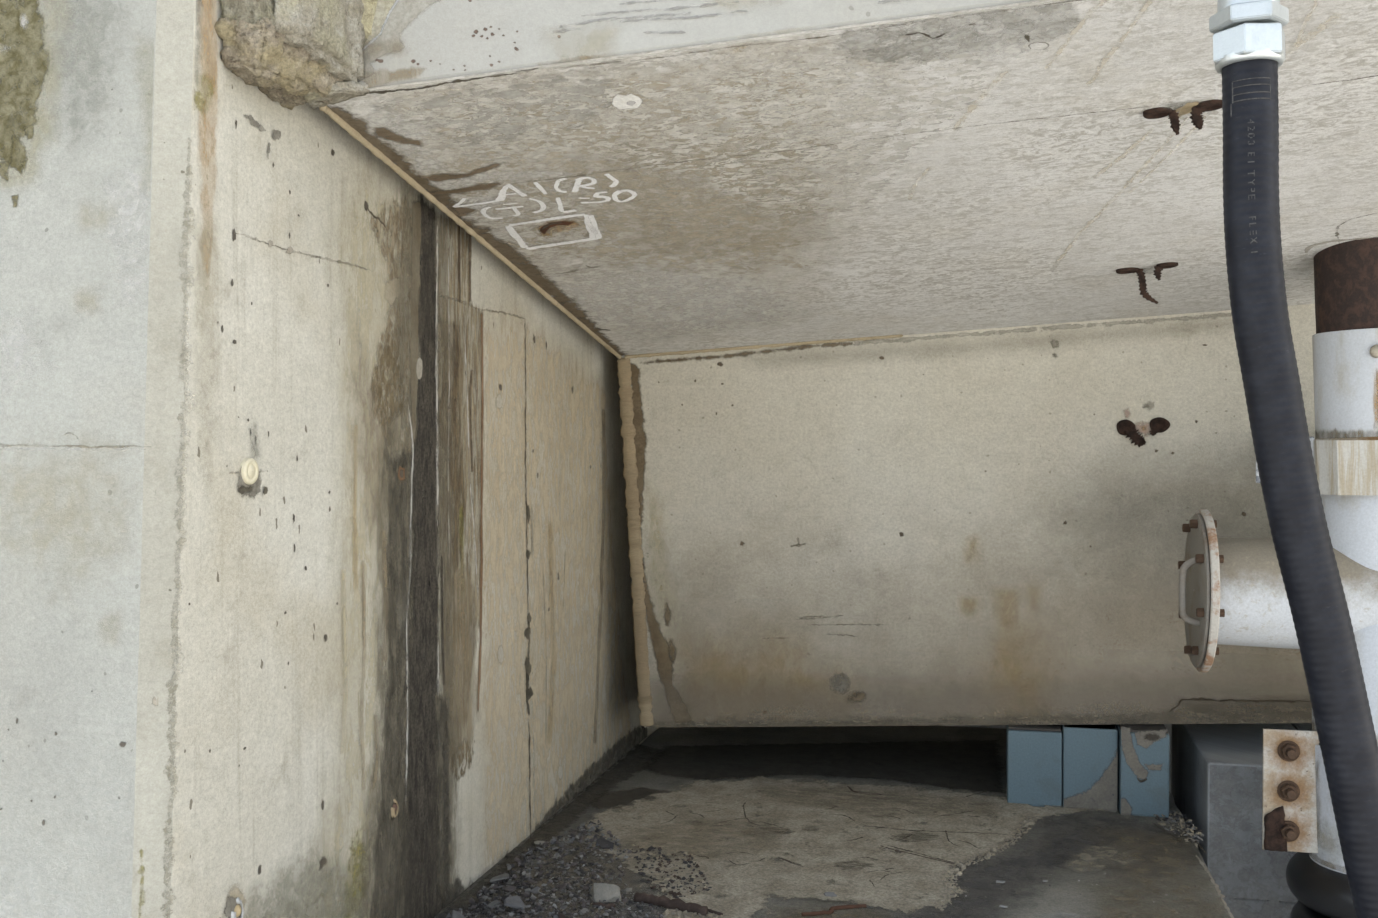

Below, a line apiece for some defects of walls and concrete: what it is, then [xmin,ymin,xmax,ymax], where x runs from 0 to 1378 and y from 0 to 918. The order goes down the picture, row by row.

peeling [0,125,34,207]
leakage [325,68,1312,918]